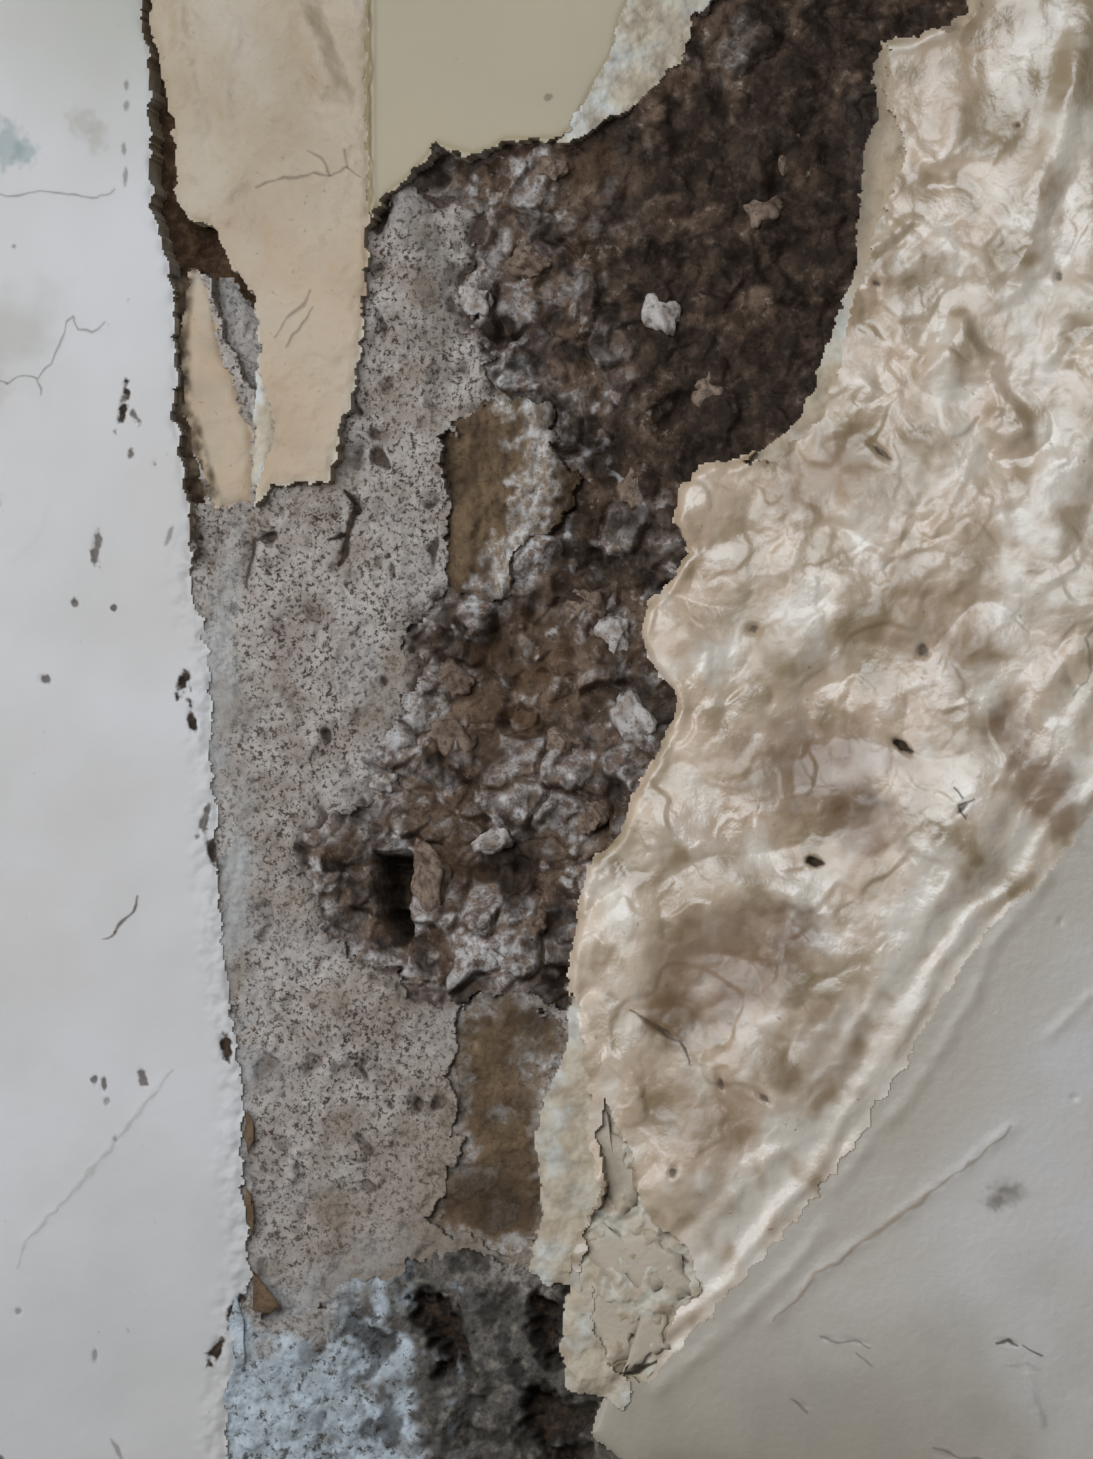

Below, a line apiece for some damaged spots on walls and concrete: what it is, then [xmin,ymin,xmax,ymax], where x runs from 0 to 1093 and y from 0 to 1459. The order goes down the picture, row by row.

spalling [149,0,983,1459]